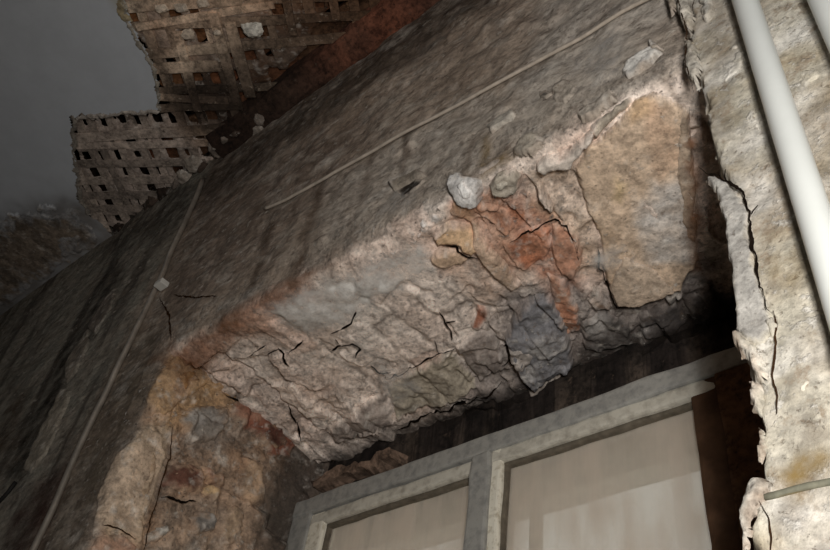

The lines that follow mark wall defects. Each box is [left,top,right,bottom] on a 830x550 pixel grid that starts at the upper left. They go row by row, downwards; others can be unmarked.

crack [677,0,694,92]
spalling [0,0,328,306]
spalling [330,90,699,443]
crack [699,167,778,413]
flaking render [89,356,295,550]
crack [249,341,303,366]
crack [288,405,301,441]
crack [330,312,455,379]
crack [392,344,515,431]
peeling [749,381,765,418]
peeling [757,428,768,464]
peeling [739,477,773,550]